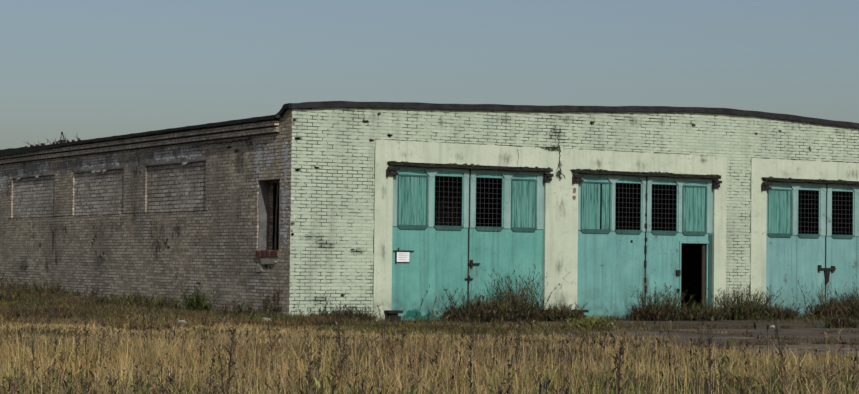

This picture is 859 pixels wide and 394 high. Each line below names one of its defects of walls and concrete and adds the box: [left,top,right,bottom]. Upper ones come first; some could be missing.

peeling [0,153,121,196]
peeling [137,147,205,175]